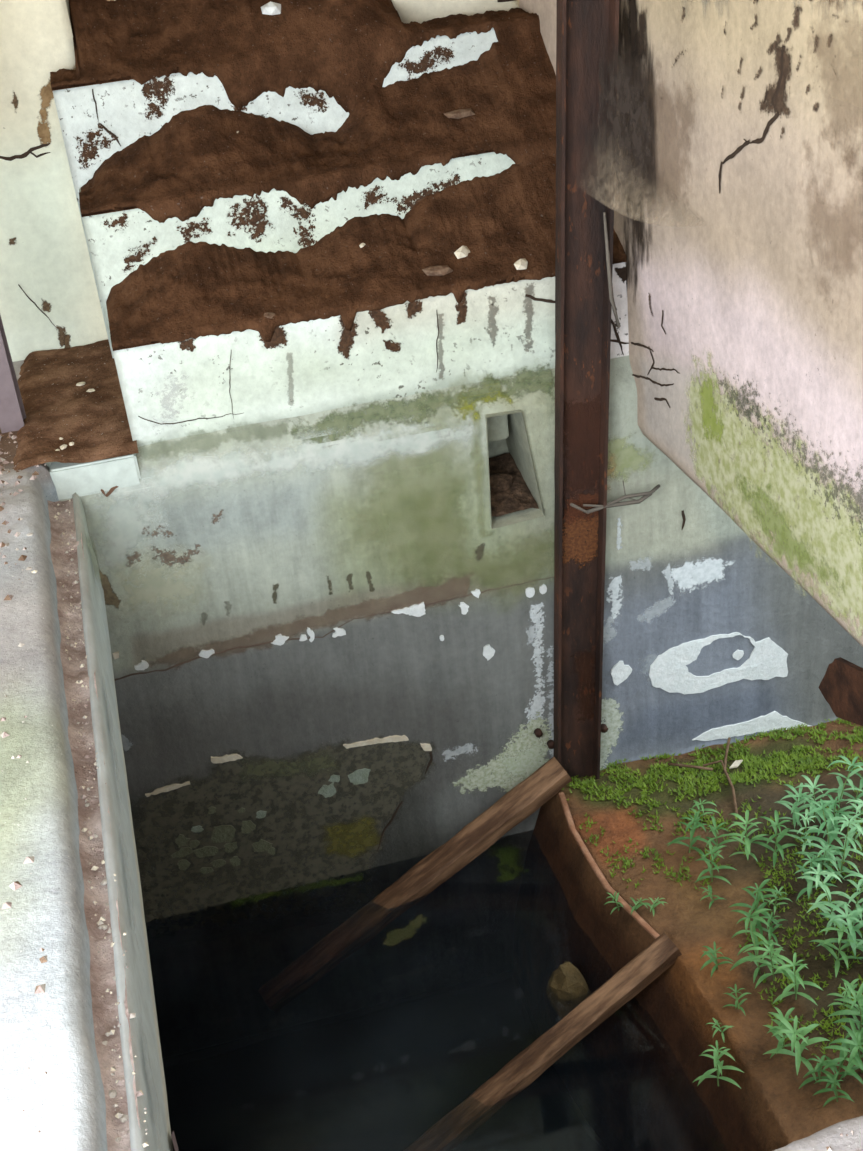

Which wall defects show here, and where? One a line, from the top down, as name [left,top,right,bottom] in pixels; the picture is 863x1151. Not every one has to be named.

crack [0,143,51,161]
peeling [74,121,118,169]
peeling [226,194,318,248]
peeling [361,172,460,215]
damp [618,0,653,289]
crack [718,43,792,193]
crack [611,310,680,408]
damp [720,375,863,546]
rust [562,490,599,568]
damp [662,557,733,596]
spalling [601,355,863,770]
spalling [59,368,555,1068]